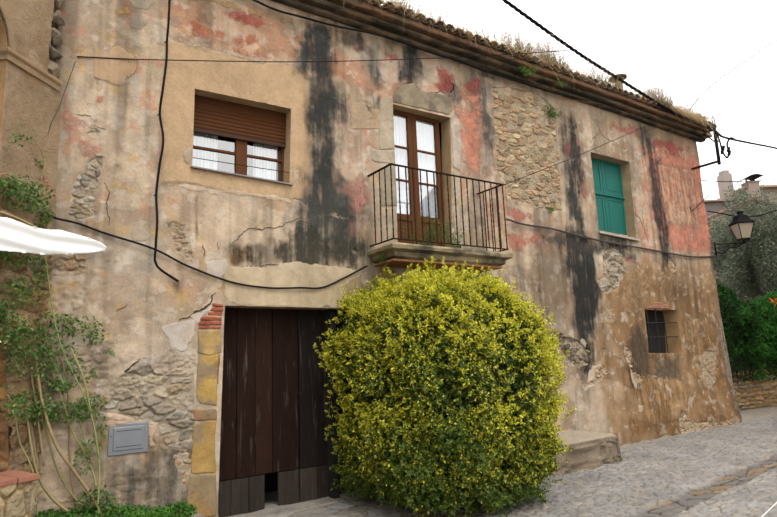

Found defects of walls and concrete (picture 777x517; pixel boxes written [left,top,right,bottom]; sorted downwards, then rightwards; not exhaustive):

flaking render [63,114,107,223]
leakage [273,24,381,266]
flaking render [161,218,196,264]
flaking render [206,258,362,308]
flaking render [596,246,632,295]
flaking render [699,317,735,397]
flaking render [95,306,213,494]
flaking render [656,407,741,439]